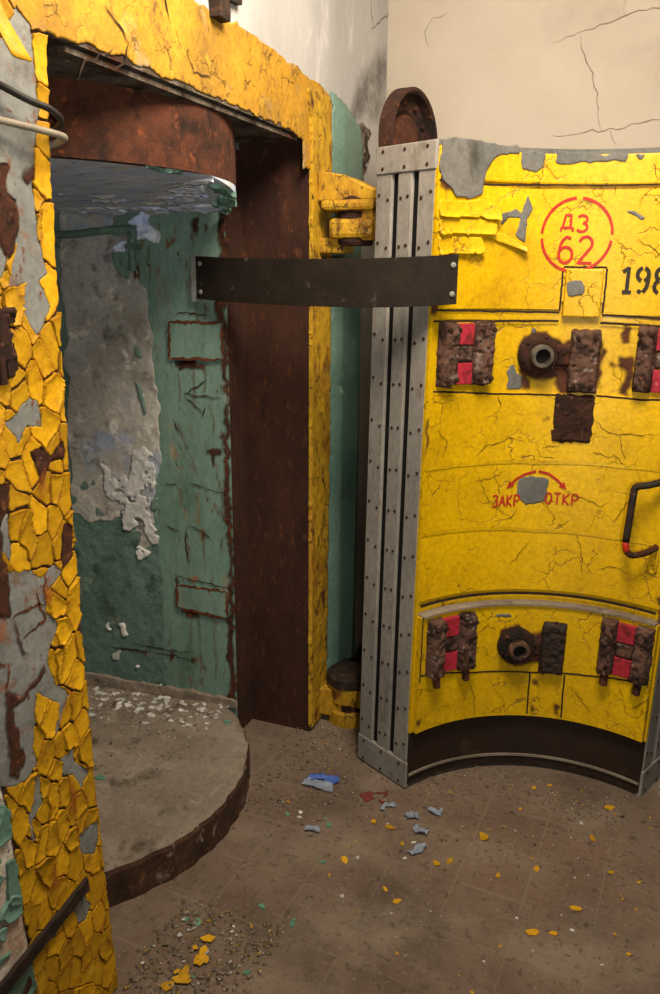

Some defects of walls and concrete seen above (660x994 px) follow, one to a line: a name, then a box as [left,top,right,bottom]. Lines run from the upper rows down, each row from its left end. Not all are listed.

crack [554,0,660,144]
corrosion [0,166,20,258]
corrosion [22,167,35,184]
corrosion [191,213,229,258]
corrosion [0,483,52,655]
corrosion [32,445,65,495]
corrosion [62,523,73,570]
peeling [0,0,237,994]
corrosion [167,301,238,701]
corrosion [0,663,47,779]